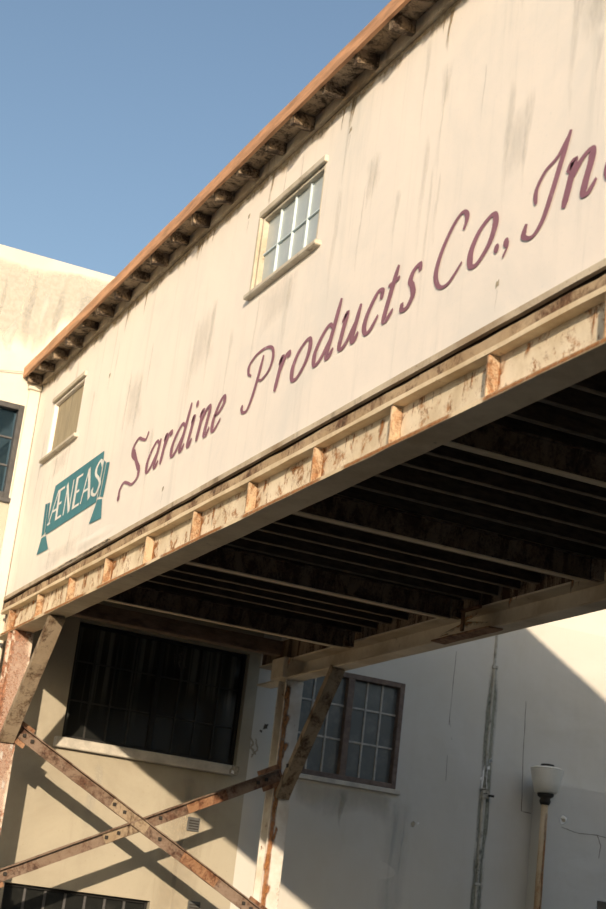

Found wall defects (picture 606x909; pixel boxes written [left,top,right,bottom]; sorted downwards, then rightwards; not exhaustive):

corrosion [483,337,606,400]
corrosion [344,414,449,468]
corrosion [242,448,327,518]
corrosion [277,685,290,769]
corrosion [261,787,278,906]